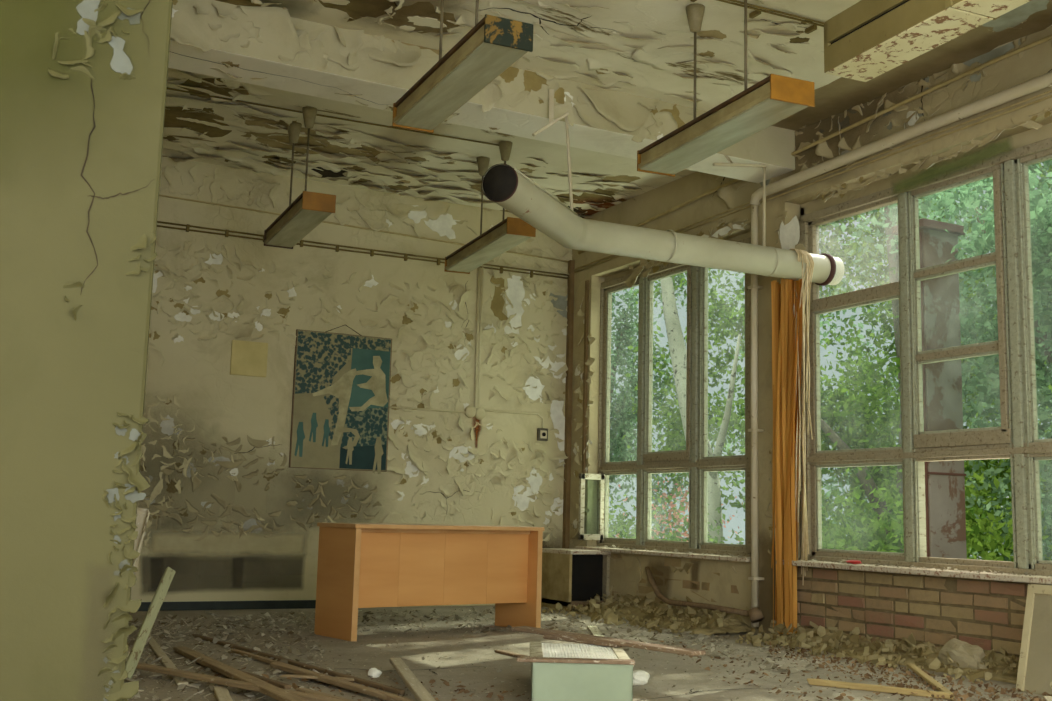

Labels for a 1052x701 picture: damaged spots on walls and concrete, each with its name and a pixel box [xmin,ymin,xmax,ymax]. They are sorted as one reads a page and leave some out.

peeling [48,0,144,81]
crack [80,78,155,295]
peeling [164,75,393,181]
peeling [216,0,471,70]
peeling [482,67,556,112]
peeling [550,188,626,218]
peeling [771,0,1052,133]
peeling [812,108,1052,203]
peeling [485,271,532,344]
peeling [522,352,566,472]
peeling [511,465,542,511]
peeling [98,412,315,701]